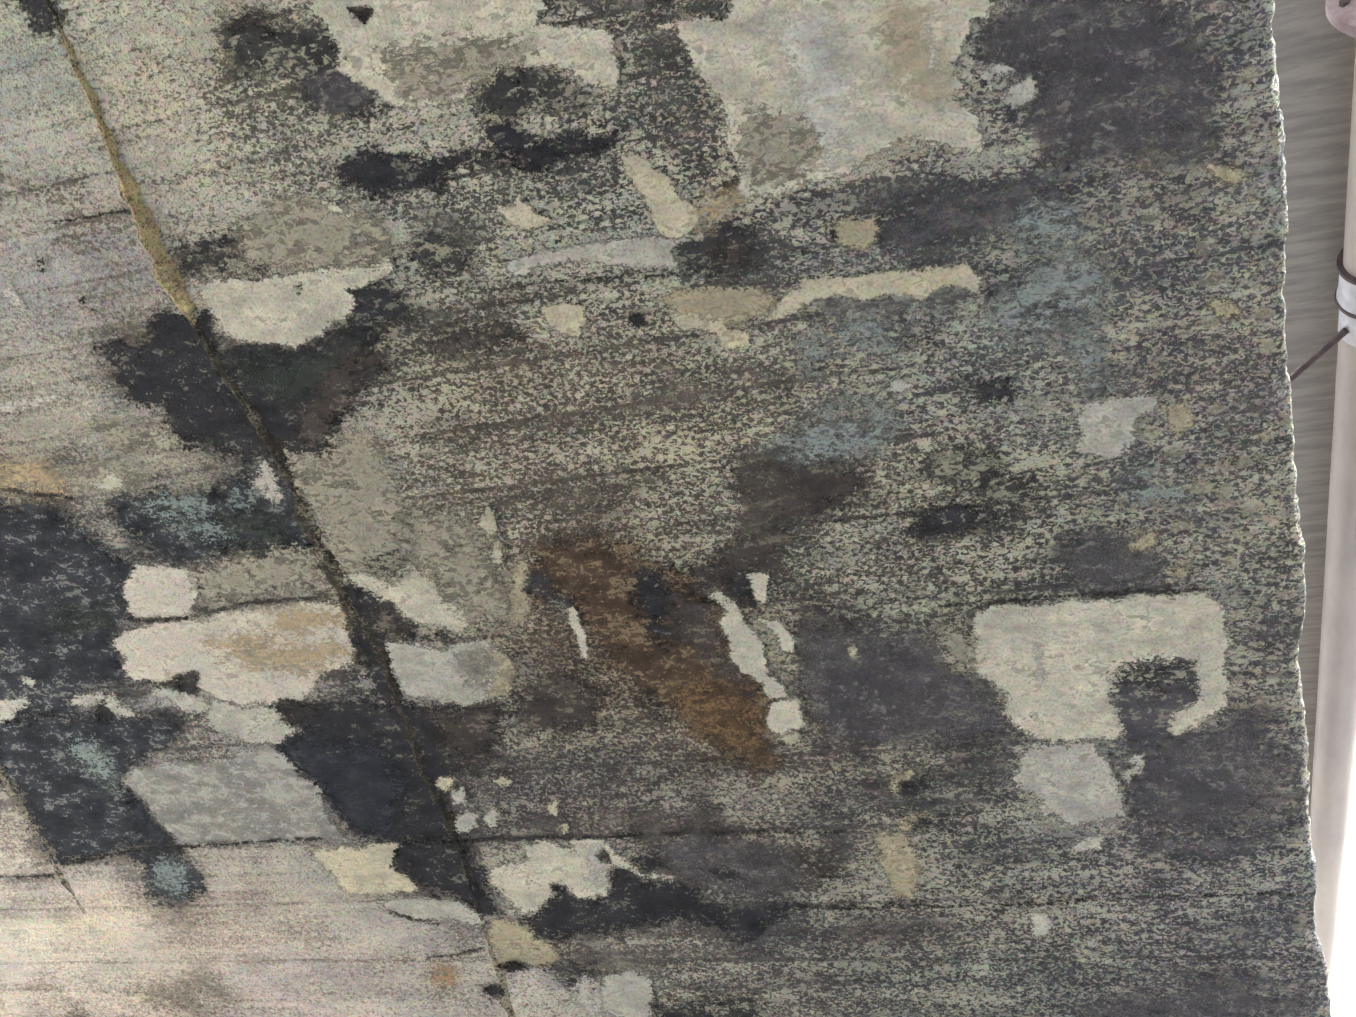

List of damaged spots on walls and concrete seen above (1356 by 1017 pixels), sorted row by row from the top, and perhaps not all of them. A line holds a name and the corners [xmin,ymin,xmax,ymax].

peeling [309,0,623,111]
crack [53,208,130,224]
peeling [197,181,401,351]
peeling [505,0,1039,352]
water stain [225,336,391,455]
water stain [42,598,117,638]
crack [126,596,316,624]
corrosion [510,445,877,788]
peeling [110,424,676,1003]
peeling [927,566,1234,855]
water stain [122,783,194,903]
crack [378,907,556,968]